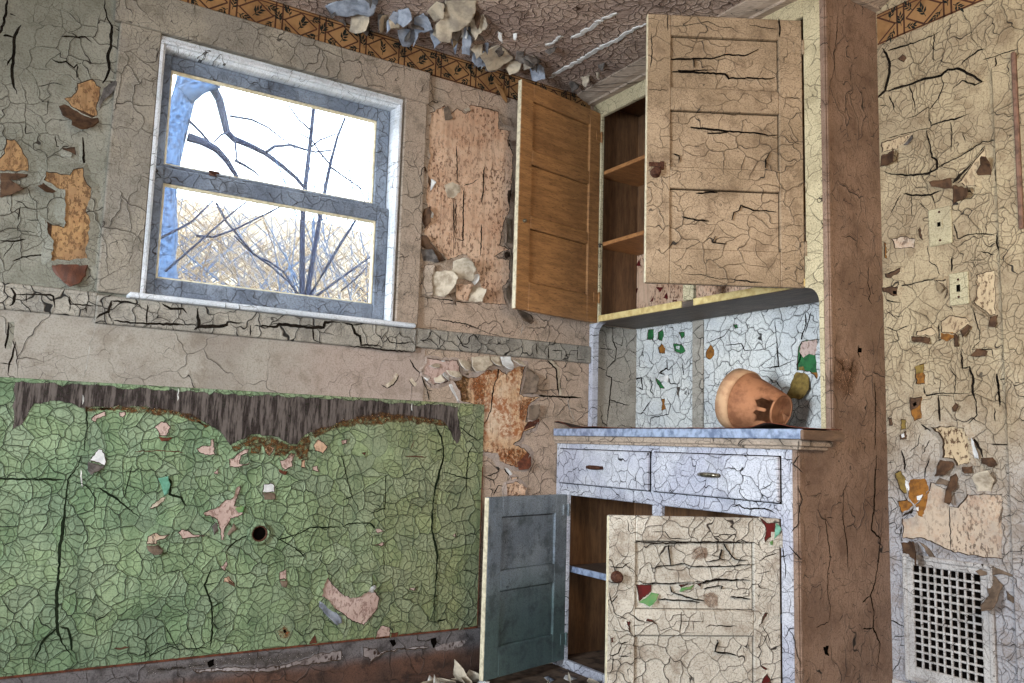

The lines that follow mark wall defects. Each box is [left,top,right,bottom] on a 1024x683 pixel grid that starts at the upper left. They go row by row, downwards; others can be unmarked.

crack [0,200,41,261]
peeling [0,134,101,287]
crack [0,0,119,170]
peeling [325,0,646,324]
crack [867,222,1000,344]
crack [878,27,1017,214]
peeling [911,268,999,347]
peeling [144,435,368,589]
crack [0,287,684,660]
peeling [418,355,541,496]
crack [816,483,848,628]
peeling [886,362,1014,611]